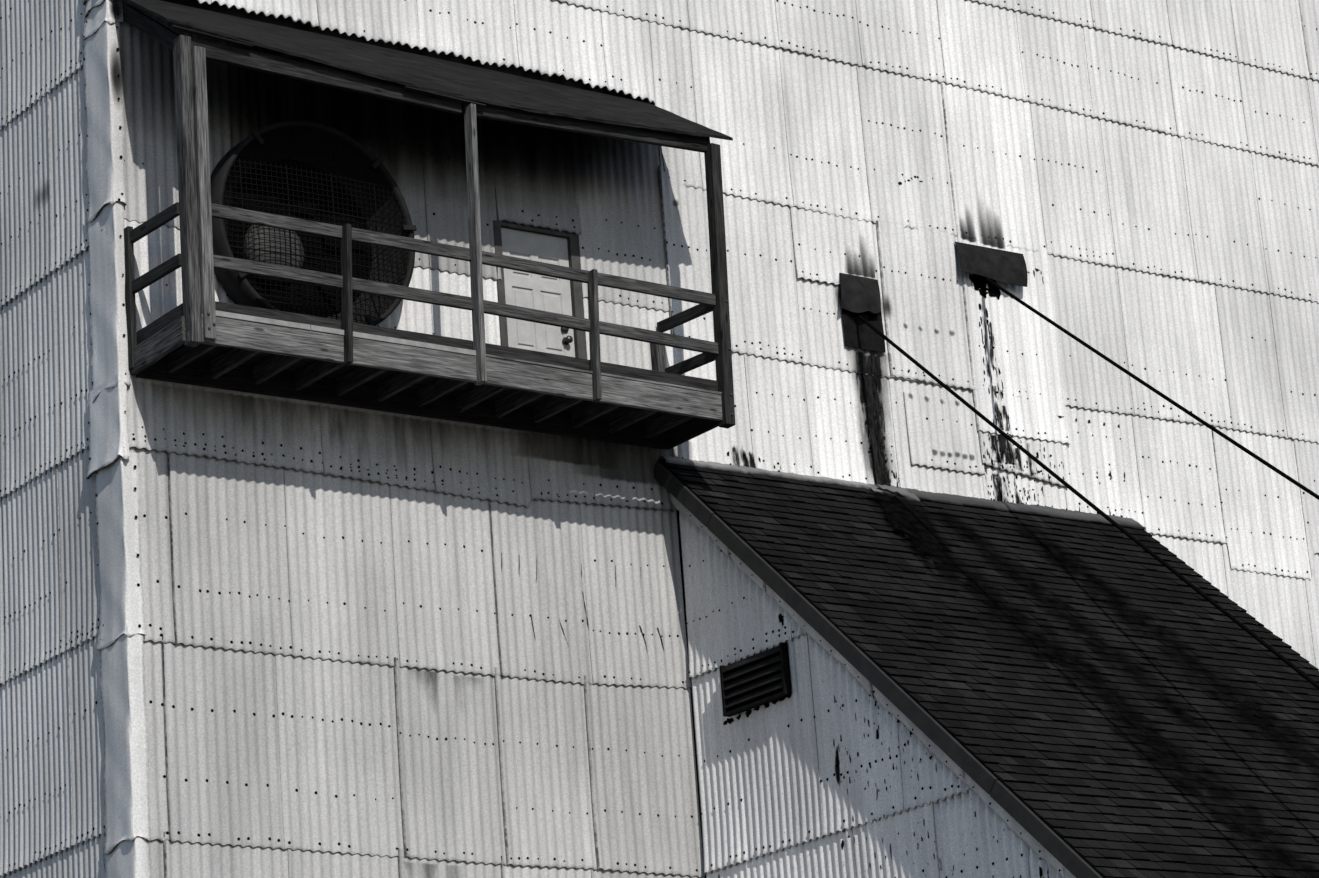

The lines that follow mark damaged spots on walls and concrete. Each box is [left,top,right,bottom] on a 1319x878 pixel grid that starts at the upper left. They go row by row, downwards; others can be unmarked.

rust [856,352,901,488]
rust [979,299,1010,431]
peeling [833,696,943,800]
peeling [841,817,978,876]